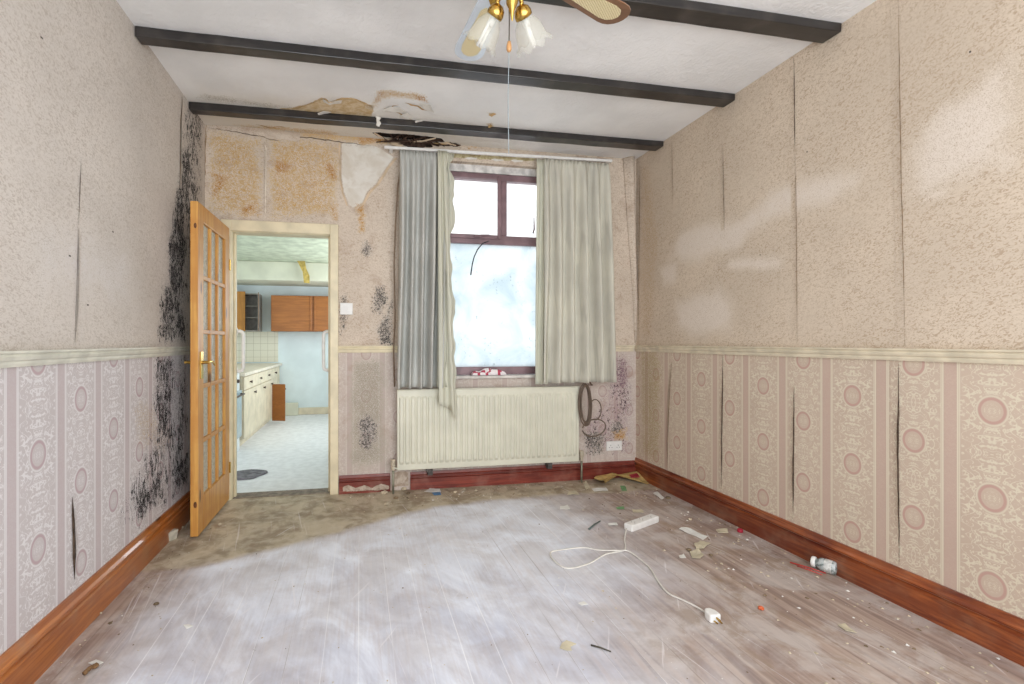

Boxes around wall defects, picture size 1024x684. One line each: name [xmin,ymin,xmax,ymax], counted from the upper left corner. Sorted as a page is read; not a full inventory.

crack [71,495,79,579]
crack [74,172,82,342]
leakage [121,109,391,528]
flaking render [279,97,381,127]
peeling [338,143,397,209]
leakage [343,284,409,487]
crack [716,356,724,488]
leakage [581,161,873,464]
crack [787,385,795,519]
crack [789,56,797,344]
crack [890,0,905,562]